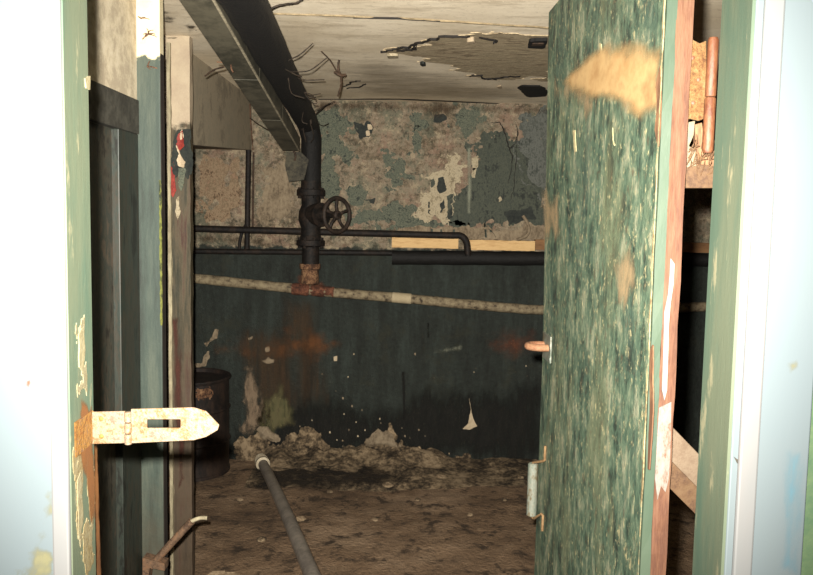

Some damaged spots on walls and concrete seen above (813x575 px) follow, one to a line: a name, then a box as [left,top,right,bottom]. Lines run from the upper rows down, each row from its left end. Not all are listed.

flaking render [171,129,242,223]
peeling [316,31,548,241]
peeling [75,315,87,398]
peeling [72,447,101,575]